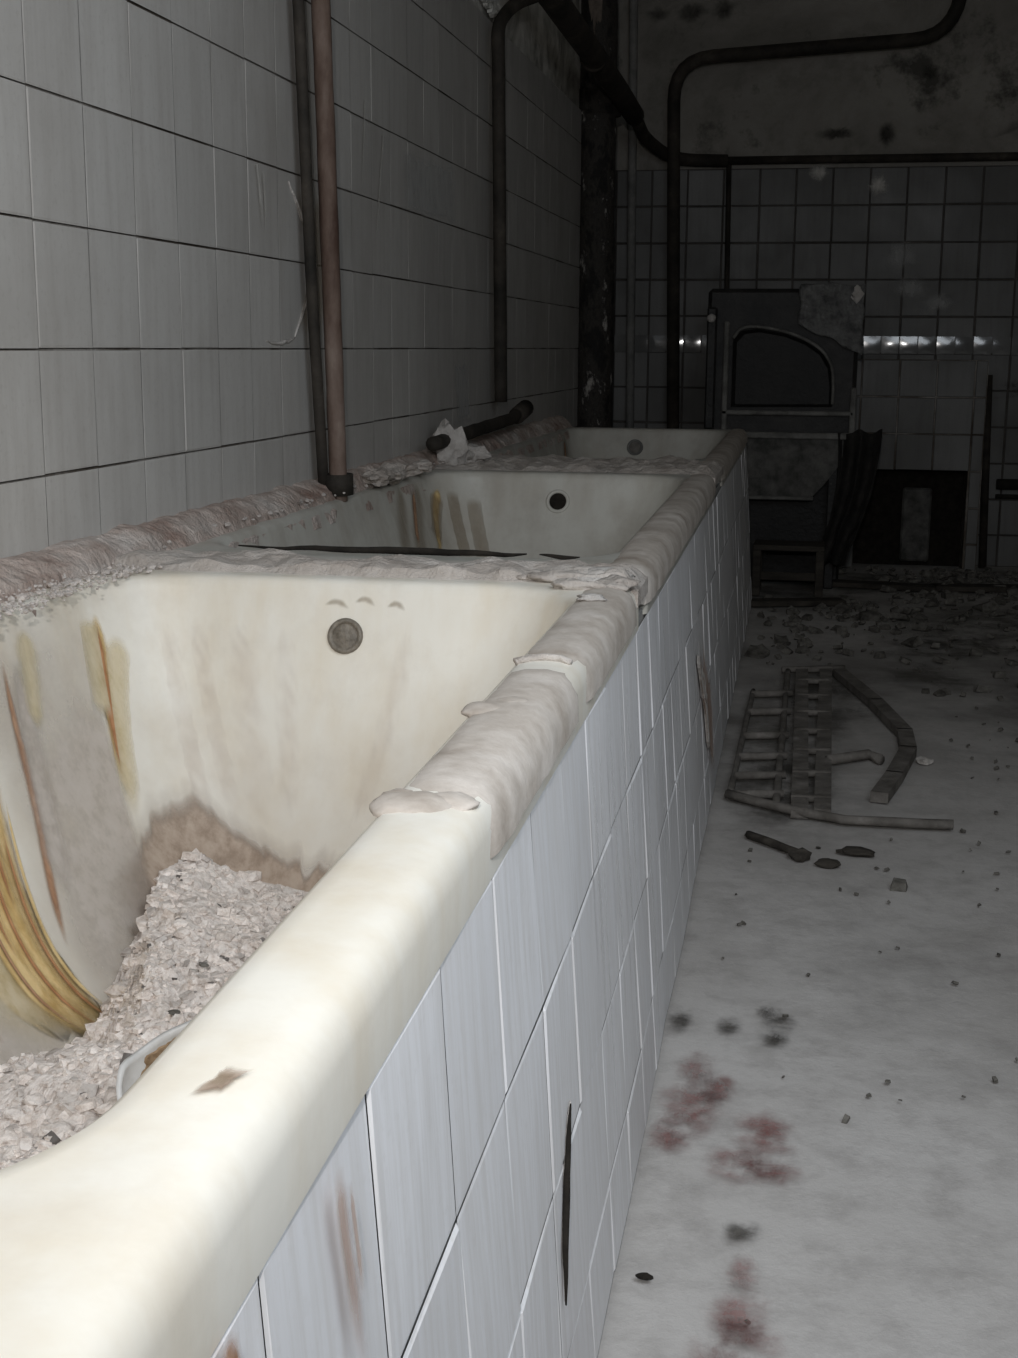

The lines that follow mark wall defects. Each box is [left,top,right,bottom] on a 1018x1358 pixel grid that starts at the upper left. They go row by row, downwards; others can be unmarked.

corrosion [84,623,135,793]
corrosion [0,636,101,1024]
peeling [197,1069,247,1091]